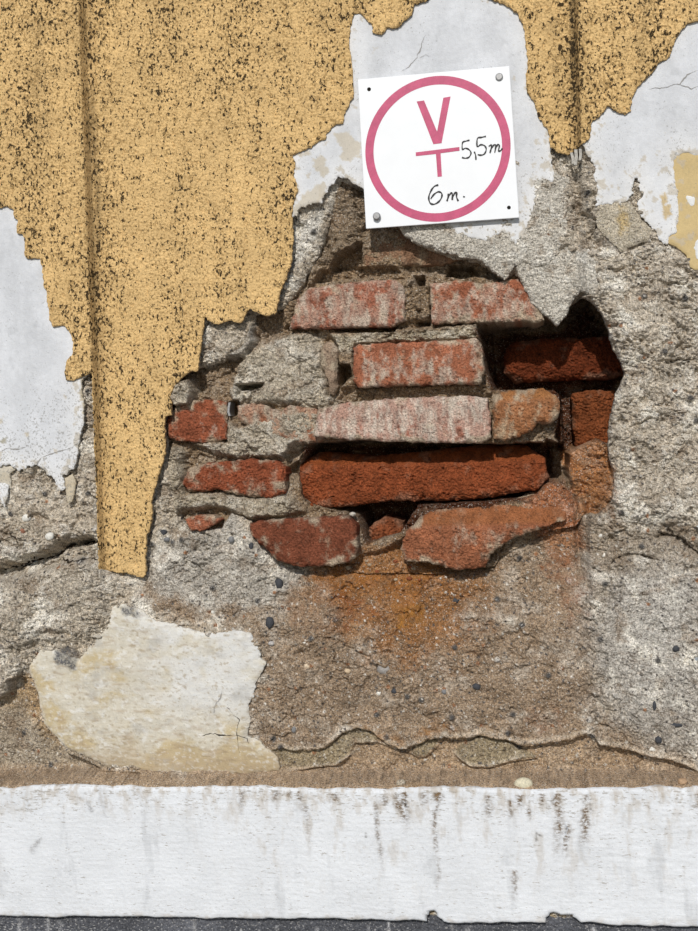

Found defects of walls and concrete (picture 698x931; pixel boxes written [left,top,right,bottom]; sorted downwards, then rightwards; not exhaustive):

crack [3,532,98,570]
spalling [0,178,698,774]
flaking render [292,0,698,573]